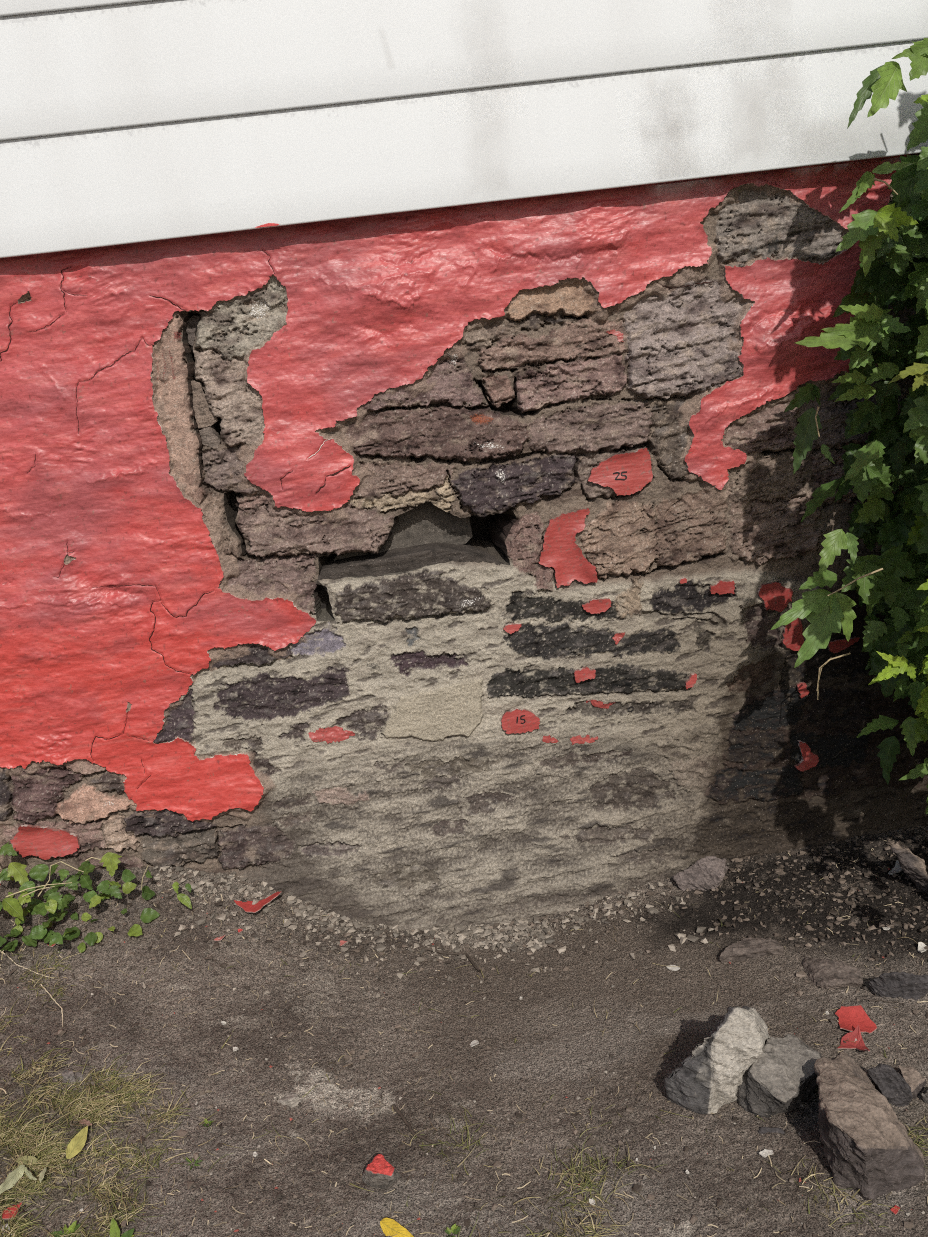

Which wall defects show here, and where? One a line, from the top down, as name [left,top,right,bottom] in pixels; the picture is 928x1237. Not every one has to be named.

crack [0,266,86,360]
spalling [0,184,928,931]
crack [101,584,210,674]
crack [90,712,151,789]